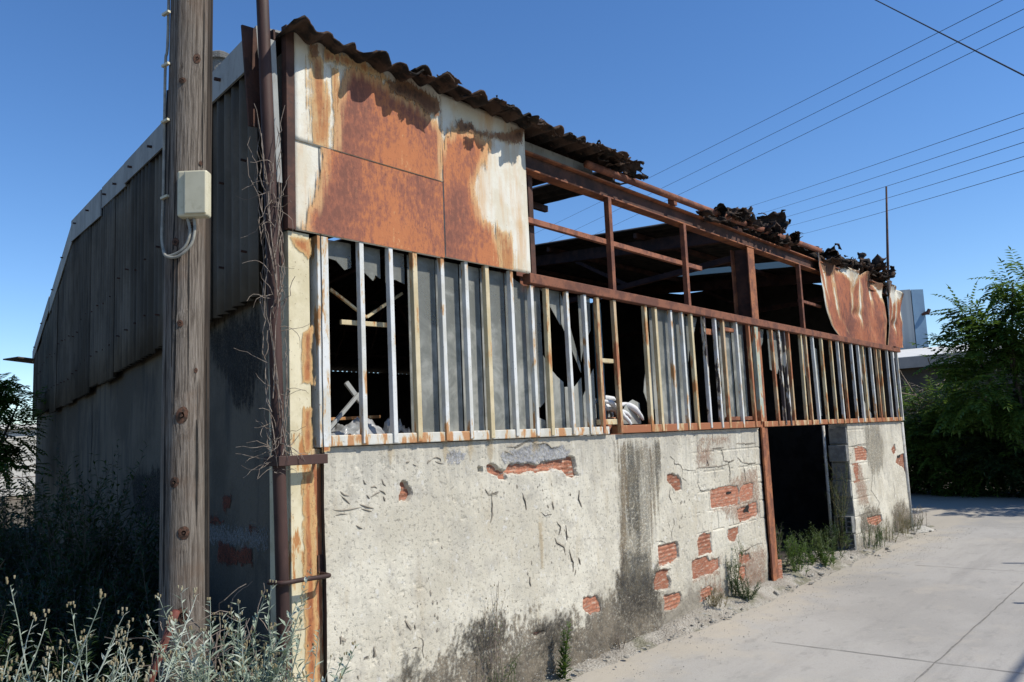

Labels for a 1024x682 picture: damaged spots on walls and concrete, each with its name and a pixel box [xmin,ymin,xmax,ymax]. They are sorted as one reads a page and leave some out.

corrosion [290,44,525,270]
corrosion [819,257,904,348]
corrosion [301,326,316,385]
corrosion [302,407,330,453]
spalling [486,442,575,498]
spalling [667,474,690,519]
crack [657,442,755,543]
spalling [710,469,760,541]
corrosion [301,468,320,682]
leakage [403,440,664,682]
spalling [654,542,680,611]
spalling [692,533,723,602]